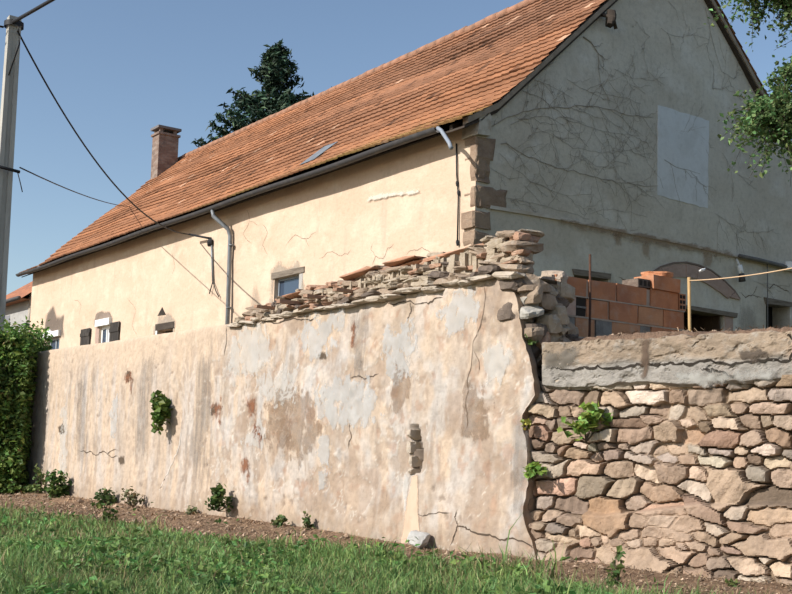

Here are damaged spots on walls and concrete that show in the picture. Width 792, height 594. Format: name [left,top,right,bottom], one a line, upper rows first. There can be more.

crack [465,286,486,428]
spalling [406,429,422,474]
crack [418,510,535,548]